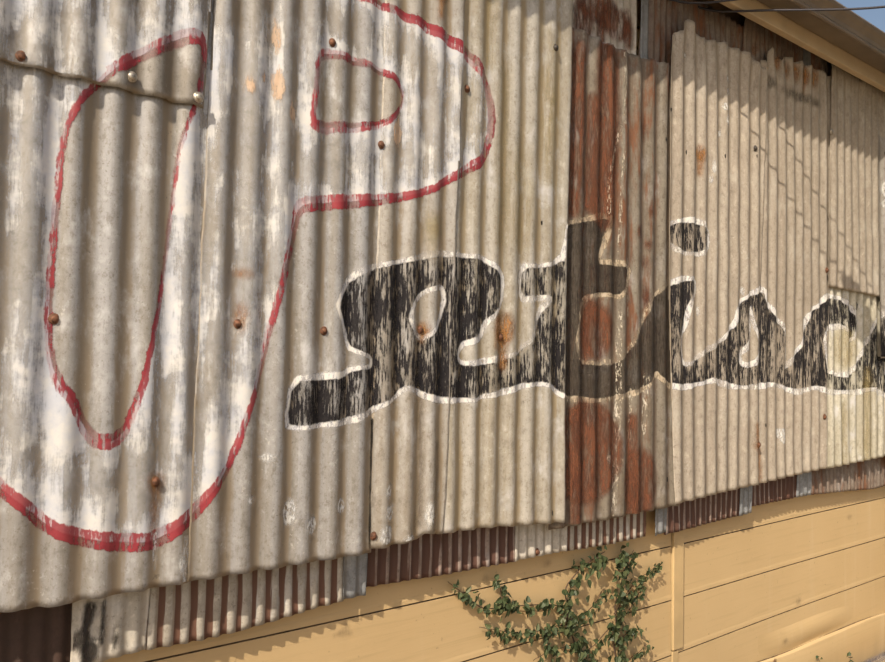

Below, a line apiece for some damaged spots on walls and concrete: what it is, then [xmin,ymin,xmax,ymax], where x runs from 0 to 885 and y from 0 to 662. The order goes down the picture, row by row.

rust [568,0,631,229]
rust [496,315,513,368]
rust [565,400,655,524]